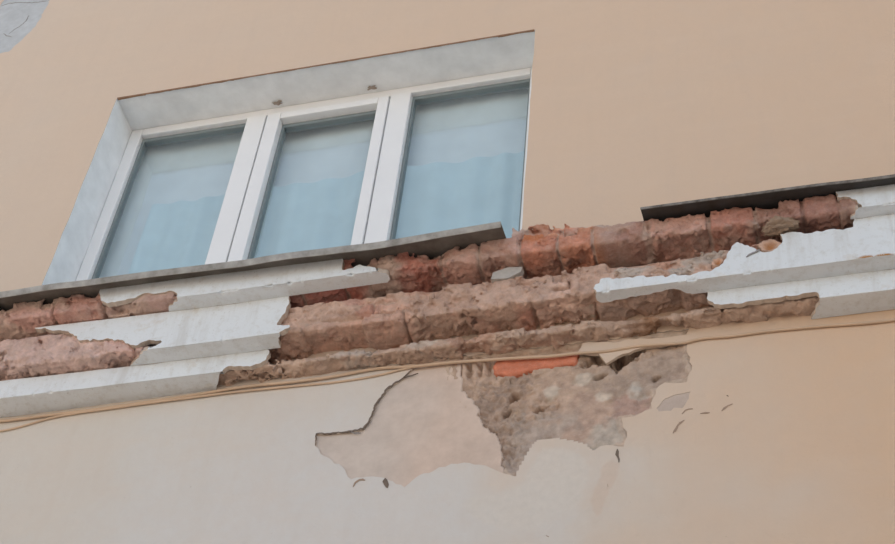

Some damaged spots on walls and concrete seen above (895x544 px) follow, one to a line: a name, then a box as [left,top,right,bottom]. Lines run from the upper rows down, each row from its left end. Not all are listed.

peeling [0,0,49,53]
flaking render [0,292,195,381]
flaking render [316,330,701,488]